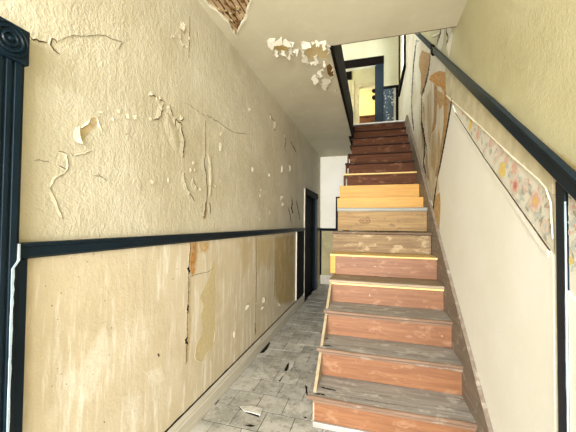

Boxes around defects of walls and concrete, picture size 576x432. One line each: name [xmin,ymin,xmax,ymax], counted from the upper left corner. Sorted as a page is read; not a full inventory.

crack [30,35,122,54]
flaking render [204,0,252,38]
peeling [266,37,337,92]
peeling [419,50,430,95]
peeling [73,111,103,144]
crack [148,90,246,217]
crack [35,150,92,220]
crack [183,245,211,364]
peeling [195,262,216,362]